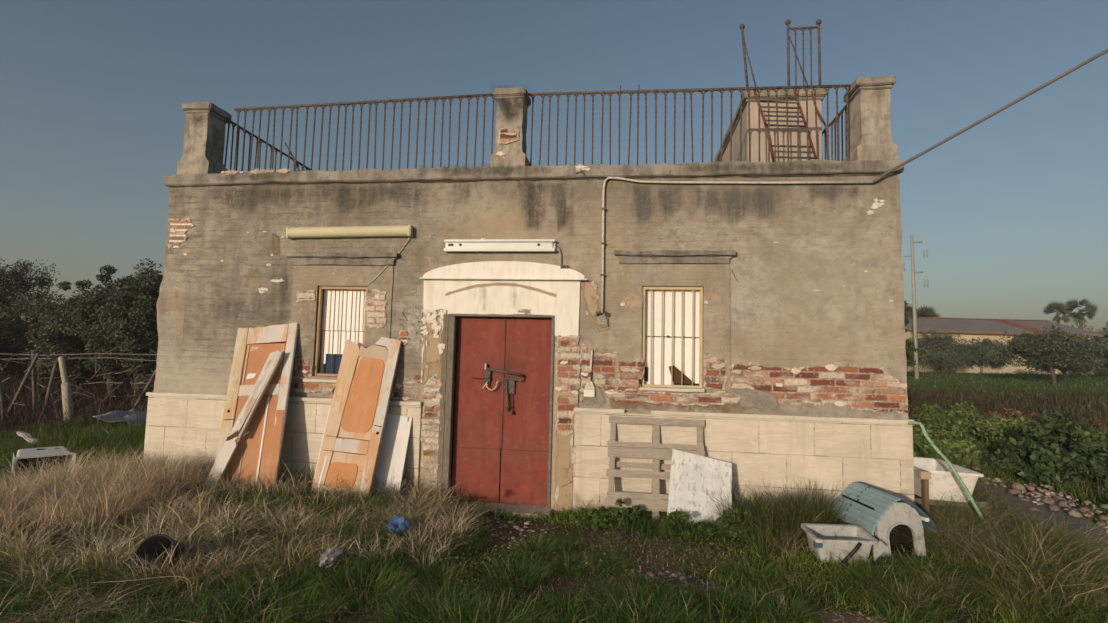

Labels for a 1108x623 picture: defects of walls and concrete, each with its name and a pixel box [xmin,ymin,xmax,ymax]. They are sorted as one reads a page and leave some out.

spalling [495,128,520,160]
water stain [524,185,538,227]
spalling [167,218,194,256]
spalling [365,289,387,329]
spalling [391,309,447,486]
spalling [553,335,909,513]